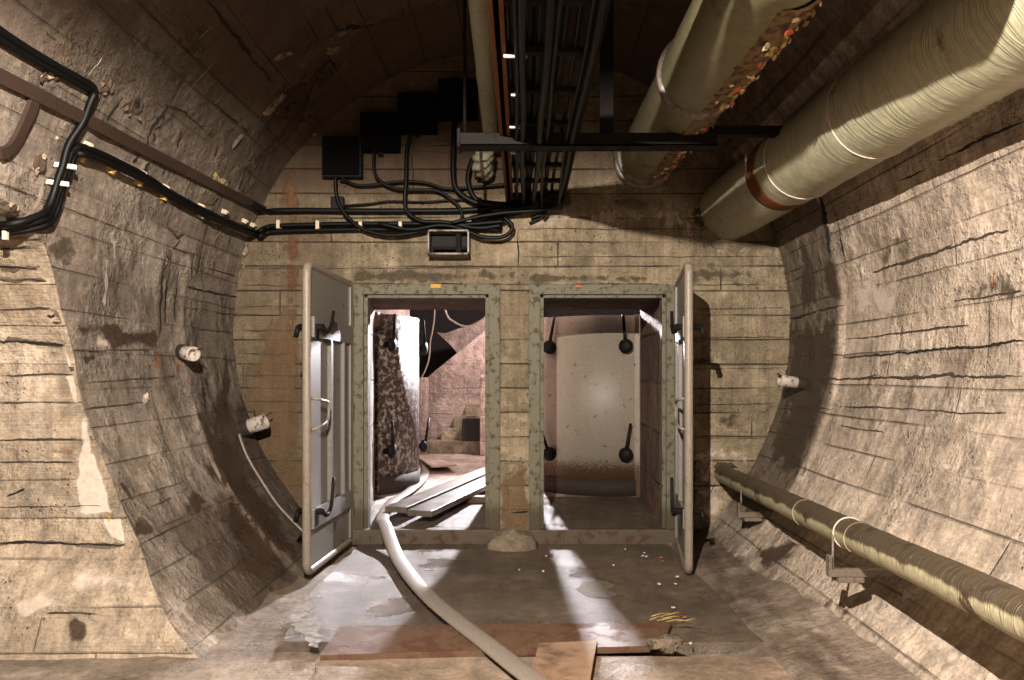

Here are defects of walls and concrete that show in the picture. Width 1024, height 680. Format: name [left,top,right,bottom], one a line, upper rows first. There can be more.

crack [133,1,290,189]
crack [898,121,1024,182]
crack [784,196,844,274]
crack [874,230,1009,272]
damp [80,324,157,364]
crack [693,284,1023,381]
crack [693,403,1006,432]
damp [69,618,86,640]